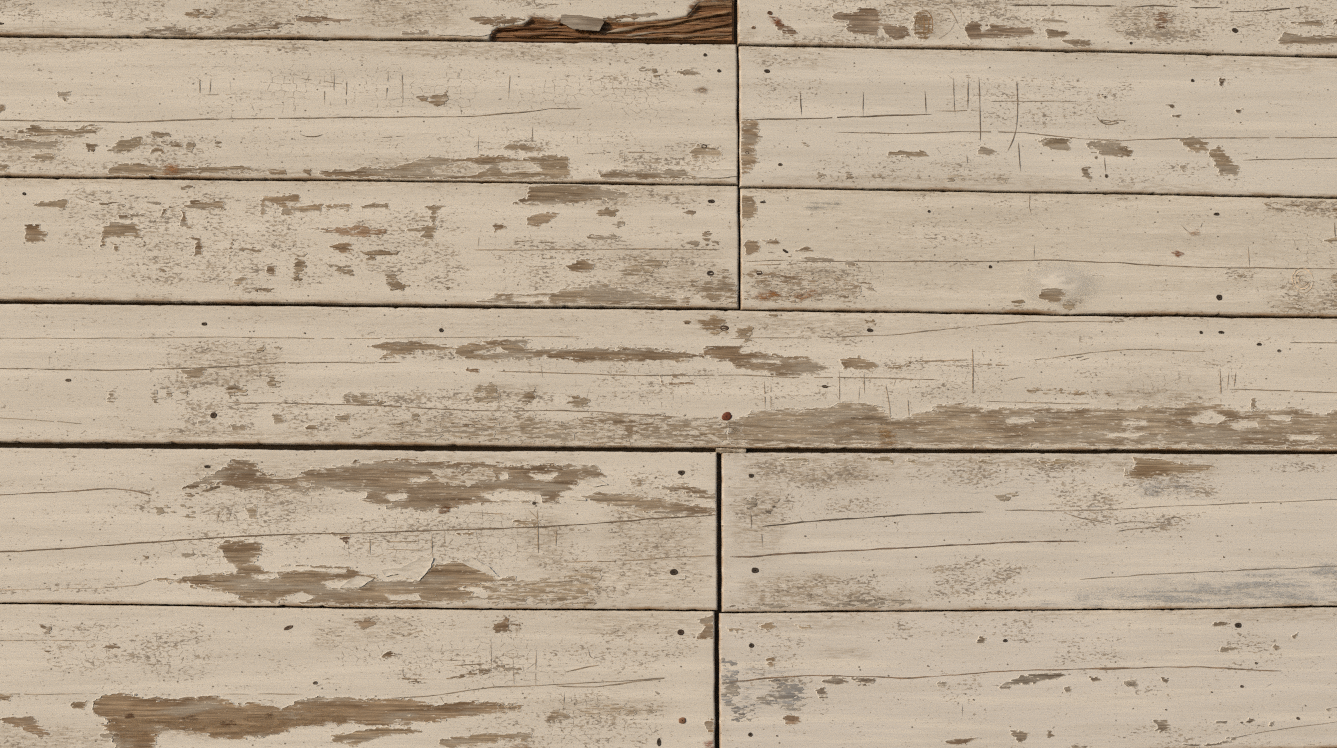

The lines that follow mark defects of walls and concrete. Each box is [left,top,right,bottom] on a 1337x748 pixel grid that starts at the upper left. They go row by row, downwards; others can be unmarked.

peeling [831,7,911,41]
peeling [962,15,1092,48]
peeling [0,124,286,257]
peeling [303,119,763,241]
peeling [1035,137,1133,182]
peeling [149,191,1337,528]
crack [0,487,150,495]
crack [0,497,1334,562]
crack [0,579,152,590]
peeling [152,539,605,633]
crack [1085,566,1332,579]
peeling [70,650,533,748]